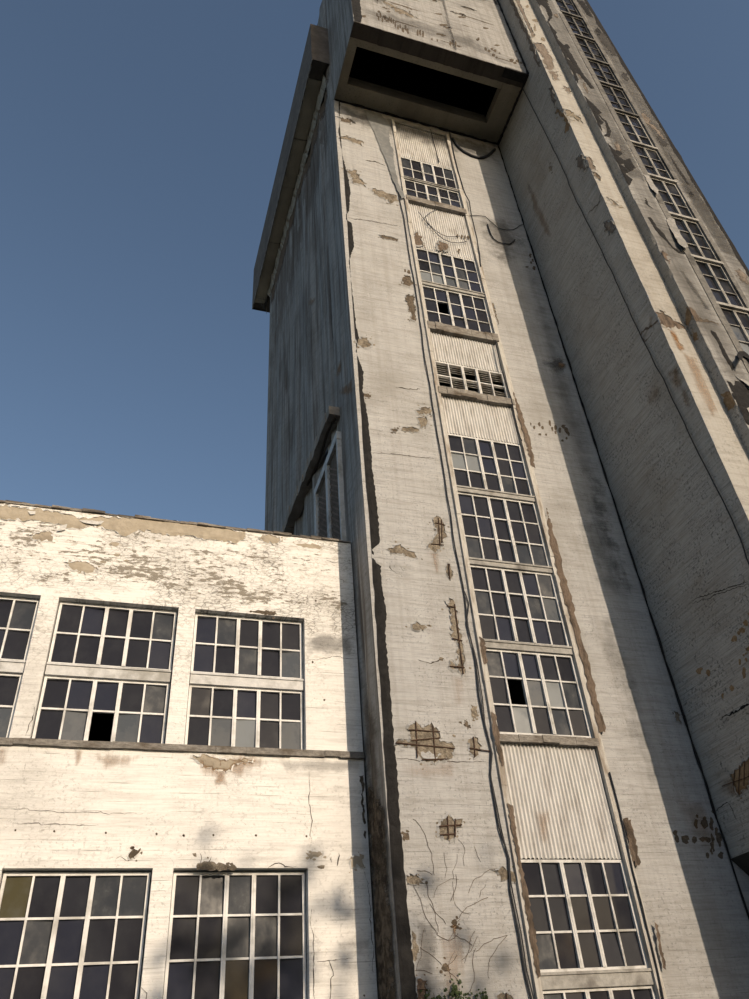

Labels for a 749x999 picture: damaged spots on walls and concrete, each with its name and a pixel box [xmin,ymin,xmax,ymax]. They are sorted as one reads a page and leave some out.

peeling [362,0,522,64]
spalling [721,390,735,411]
spalling [385,514,449,560]
peeling [0,504,347,619]
crack [692,581,749,604]
spalling [441,597,471,678]
spalling [394,705,490,770]
peeling [190,753,255,774]
spalling [722,755,749,799]
spalling [435,811,465,844]
peeling [673,811,723,859]